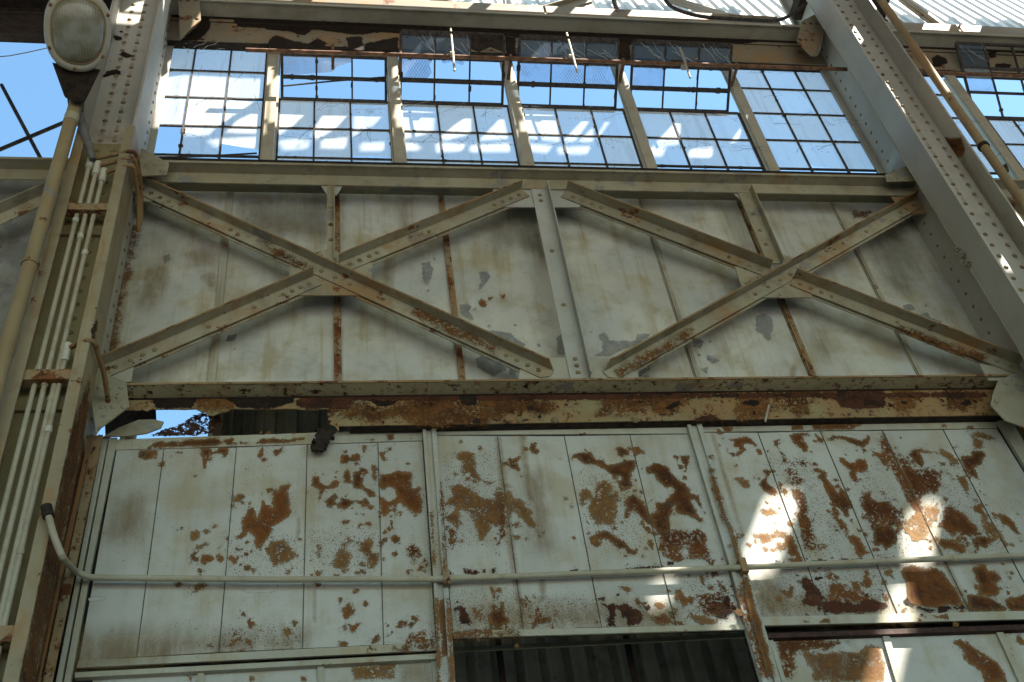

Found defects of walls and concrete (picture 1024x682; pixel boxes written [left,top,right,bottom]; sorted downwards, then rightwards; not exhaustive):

peeling [460,271,490,320]
rust [411,308,497,353]
rust [613,328,690,378]
peeling [752,312,773,340]
rust [138,389,1024,682]